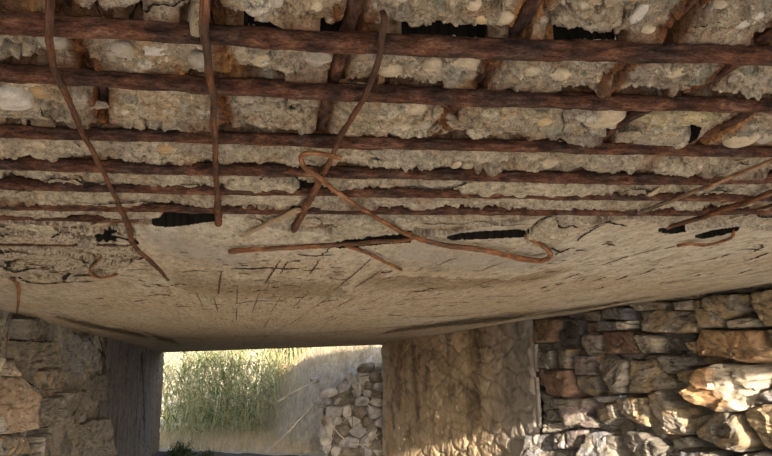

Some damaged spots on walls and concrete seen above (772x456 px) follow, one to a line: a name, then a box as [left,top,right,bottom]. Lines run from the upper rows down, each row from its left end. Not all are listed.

spalling [0,0,347,83]
spalling [357,0,772,47]
spalling [339,54,772,101]
corrosion [88,86,107,124]
spalling [0,82,772,281]
crack [424,216,625,255]
crack [232,248,331,302]